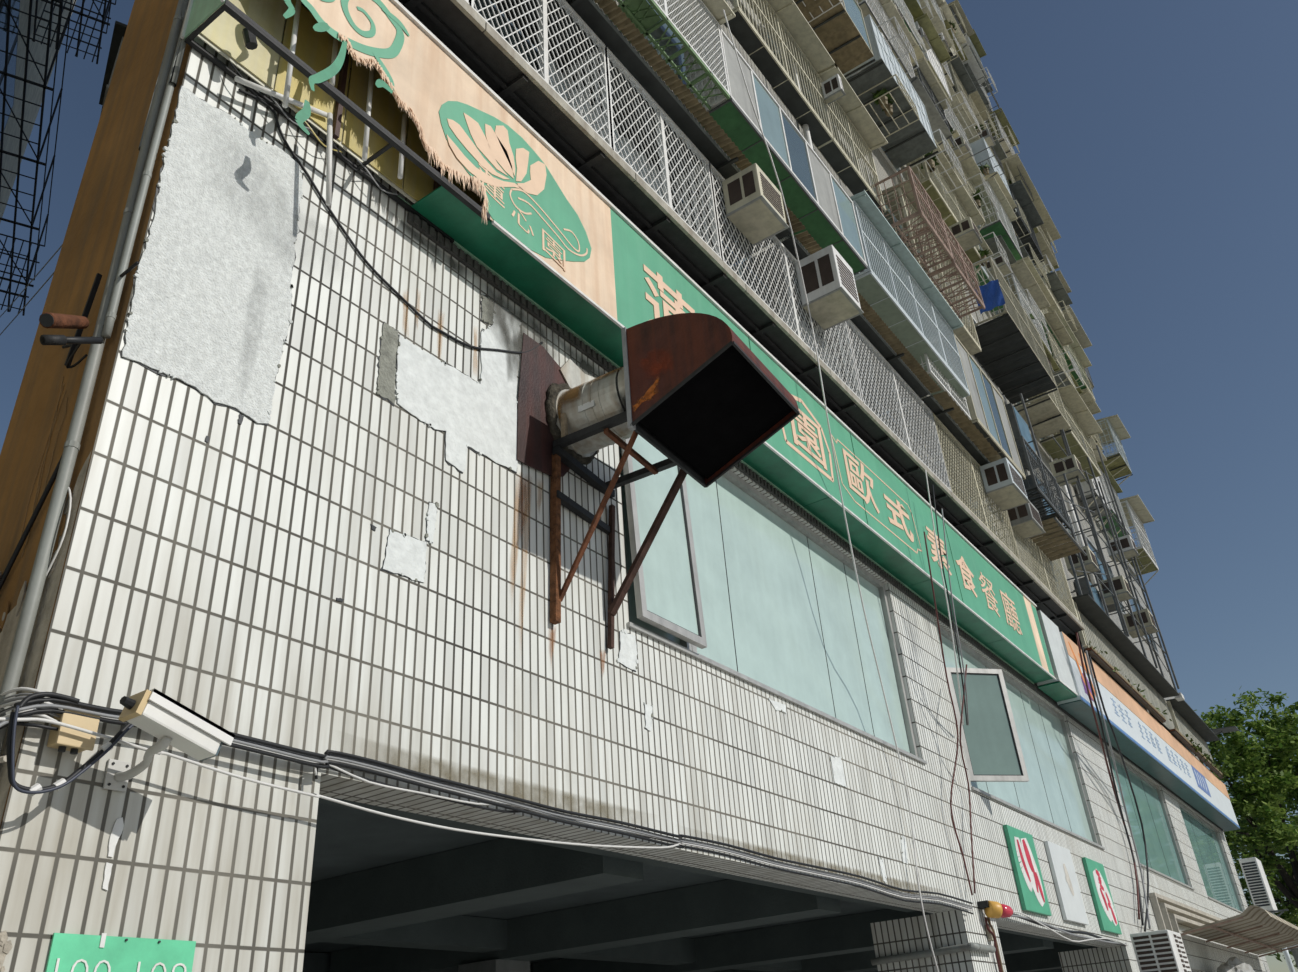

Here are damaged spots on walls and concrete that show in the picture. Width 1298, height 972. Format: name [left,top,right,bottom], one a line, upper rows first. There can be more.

peeling [0,450,92,829]
peeling [120,86,304,426]
flaking render [370,502,439,583]
peeling [376,294,521,474]